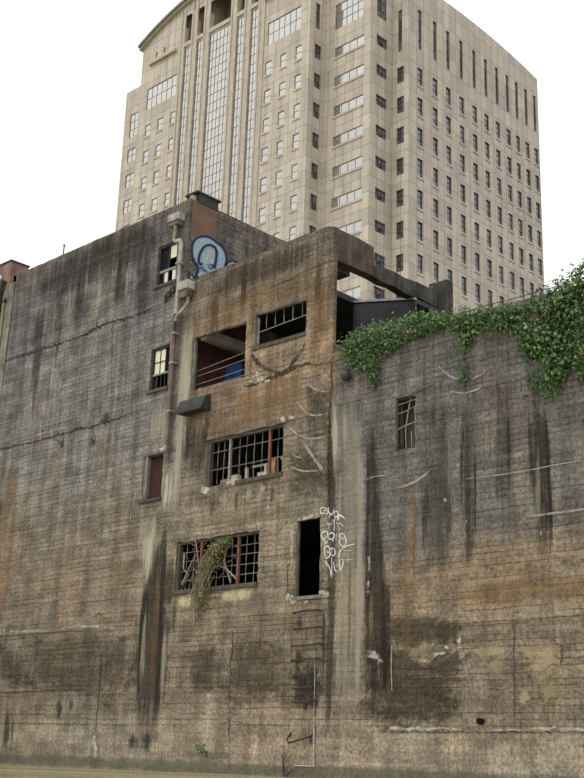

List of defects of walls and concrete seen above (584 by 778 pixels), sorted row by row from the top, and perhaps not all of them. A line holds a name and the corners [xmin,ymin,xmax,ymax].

crack [5,307,150,382]
spalling [245,343,323,387]
crack [1,384,143,455]
leakage [143,522,155,579]
spalling [367,635,392,690]
spalling [390,718,584,733]